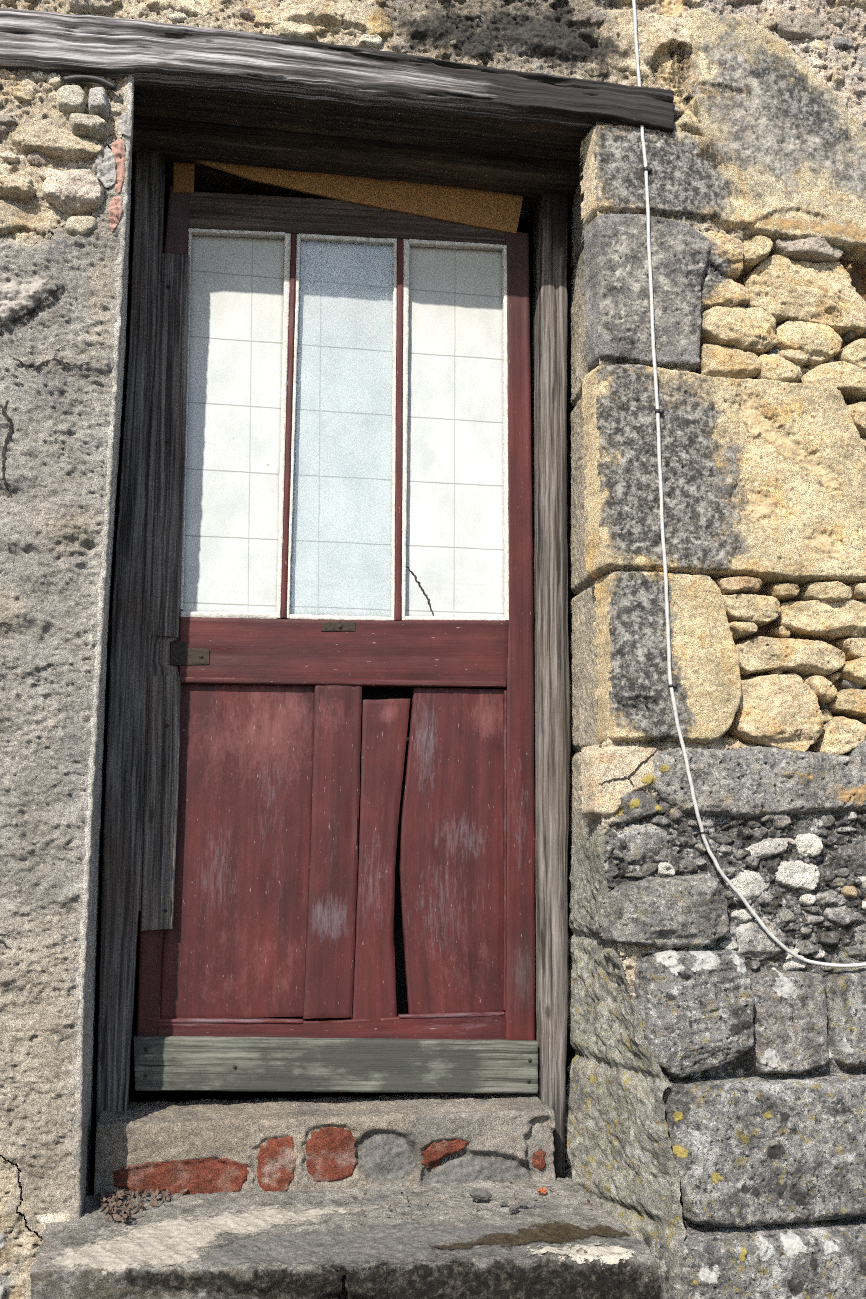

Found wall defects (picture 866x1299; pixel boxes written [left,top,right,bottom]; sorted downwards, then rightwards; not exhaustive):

crack [0,289,92,368]
crack [0,400,13,491]
crack [599,749,658,787]